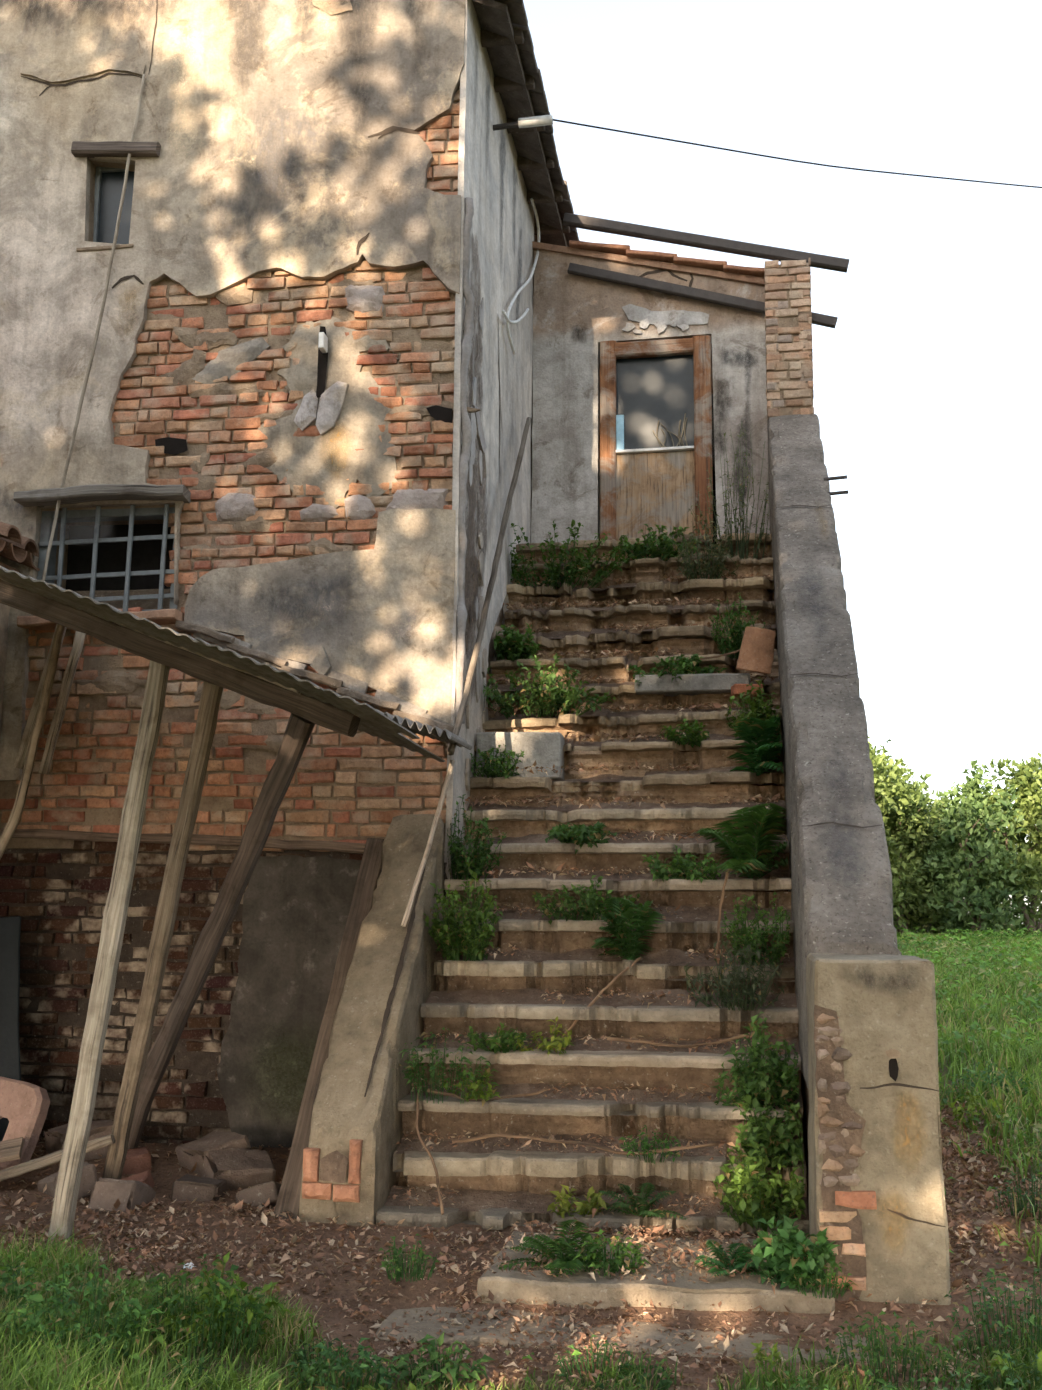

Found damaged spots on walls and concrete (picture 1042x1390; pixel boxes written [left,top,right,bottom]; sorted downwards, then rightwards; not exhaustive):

crack [20,0,158,96]
water stain [229,0,261,82]
water stain [229,108,329,192]
crack [368,126,420,138]
spalling [378,86,460,195]
spalling [111,234,504,733]
spalling [0,615,150,1139]
spalling [131,669,203,890]
spalling [151,688,291,1048]
spalling [260,724,448,860]
spalling [139,921,243,1144]
spalling [813,1004,877,1301]